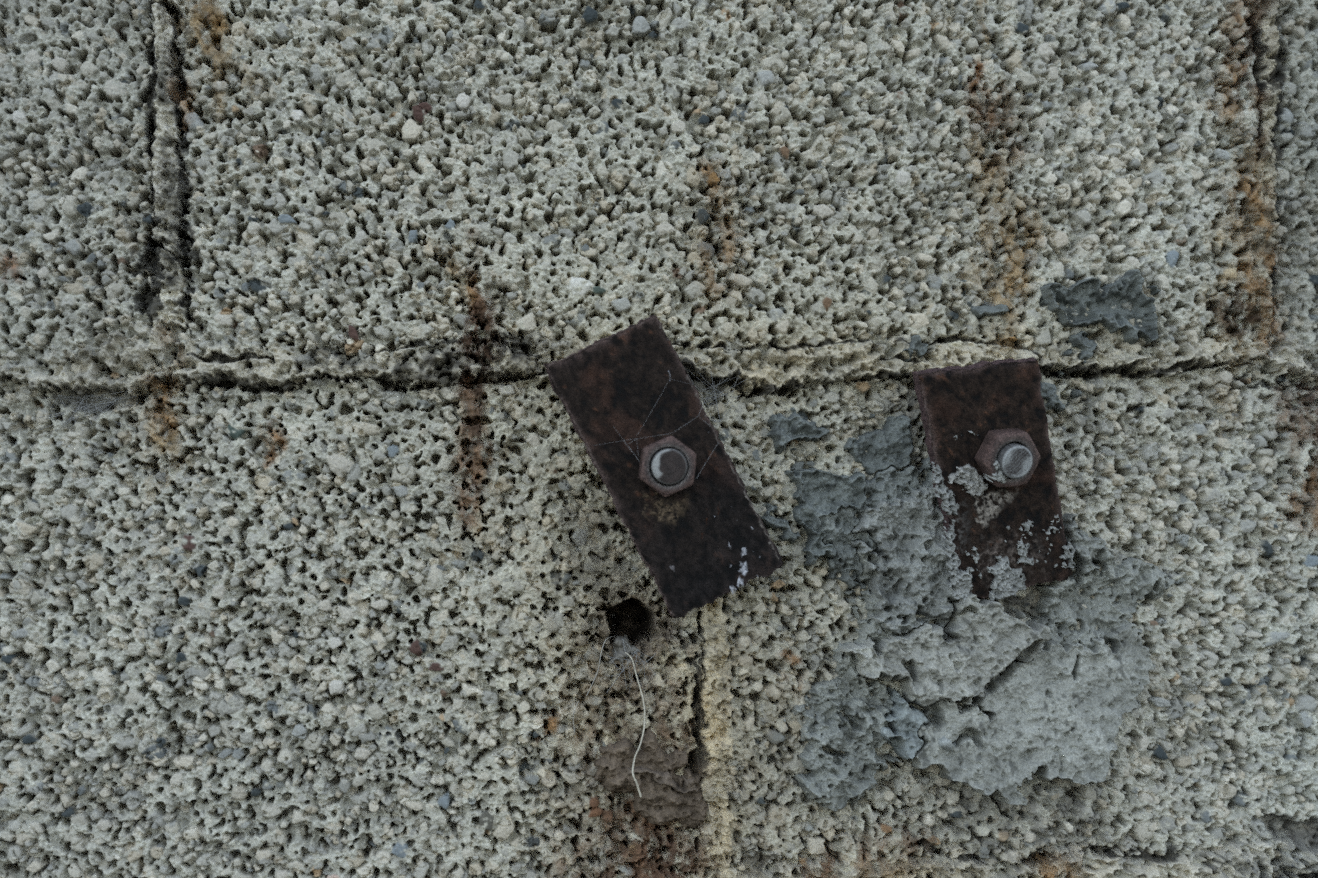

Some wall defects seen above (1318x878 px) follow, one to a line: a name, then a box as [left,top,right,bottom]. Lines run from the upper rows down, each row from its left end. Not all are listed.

crack [125,0,547,400]
rust [1220,185,1270,333]
rust [457,271,492,524]
spalling [993,596,1030,605]
rust [630,814,675,878]